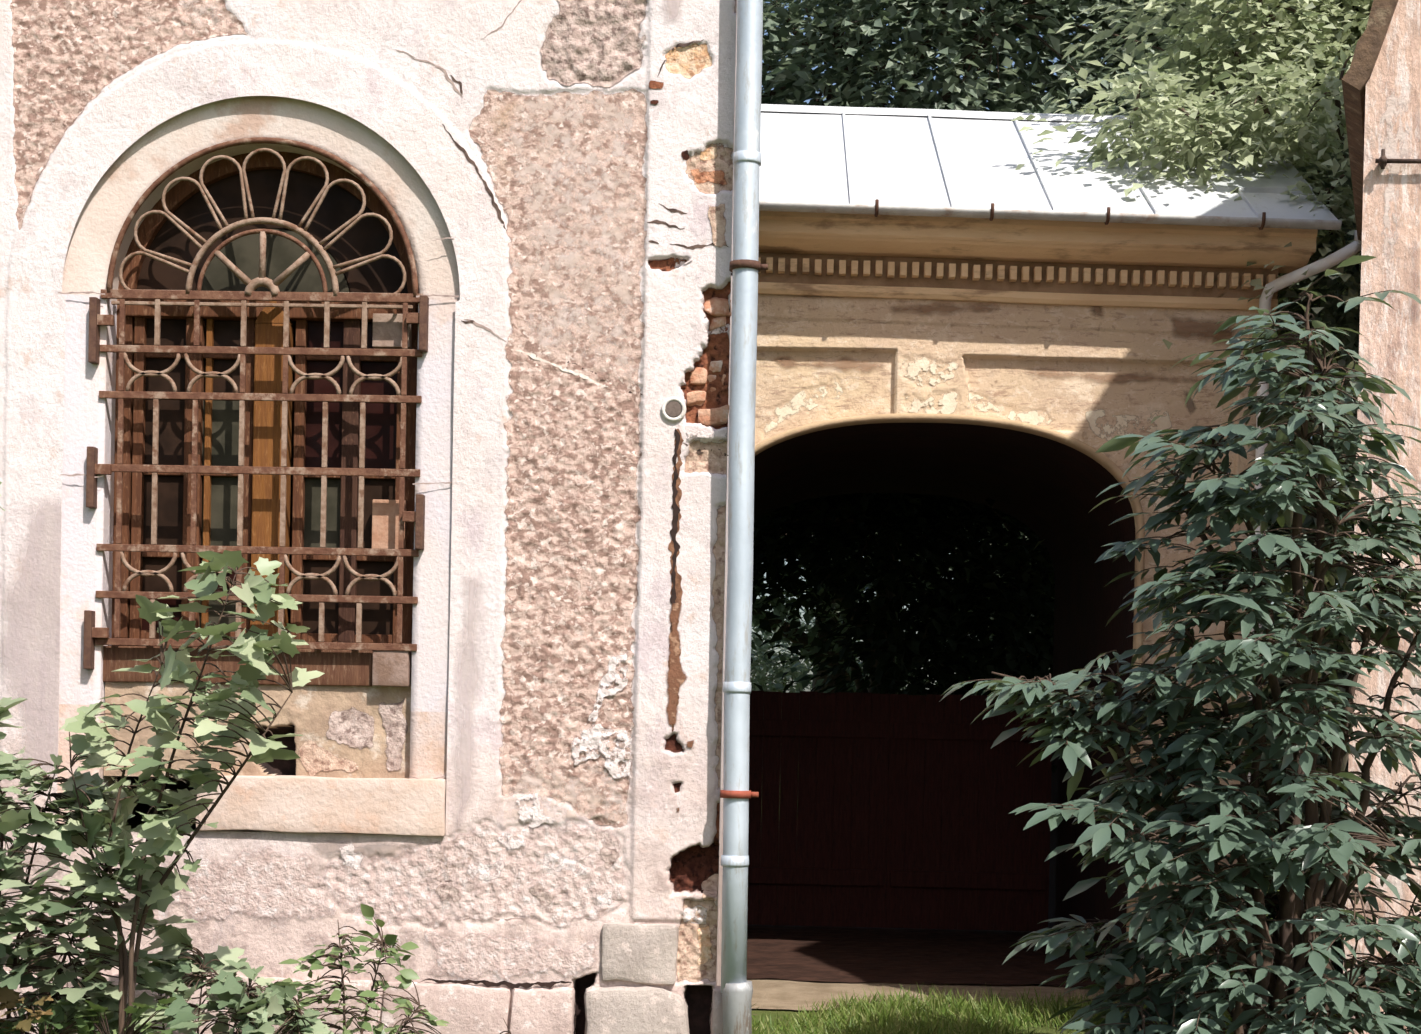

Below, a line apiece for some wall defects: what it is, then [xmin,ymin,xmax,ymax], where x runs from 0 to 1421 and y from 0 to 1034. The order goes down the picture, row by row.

crack [396,49,508,231]
crack [481,0,522,40]
spalling [540,0,712,105]
flaking render [681,143,733,248]
flaking render [681,281,732,475]
crack [666,429,687,732]